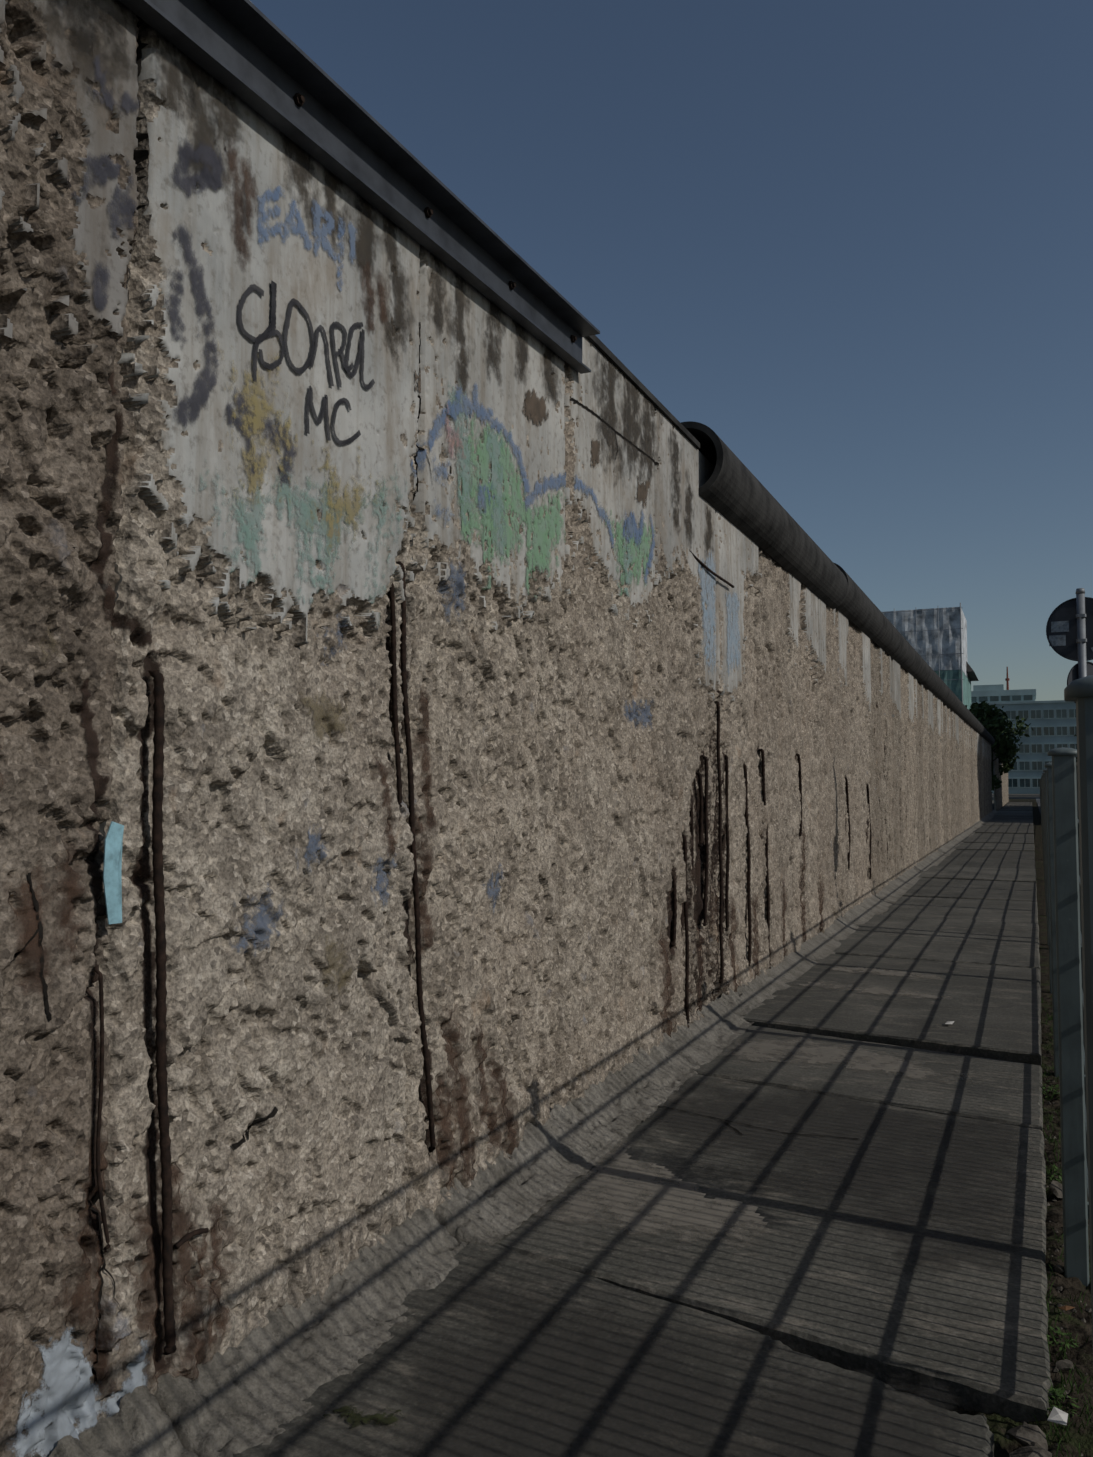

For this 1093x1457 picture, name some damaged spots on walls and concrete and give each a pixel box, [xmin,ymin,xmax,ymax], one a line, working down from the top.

spalling [0,0,840,1457]
spalling [836,619,958,917]
spalling [958,716,983,833]
spalling [987,742,1009,814]